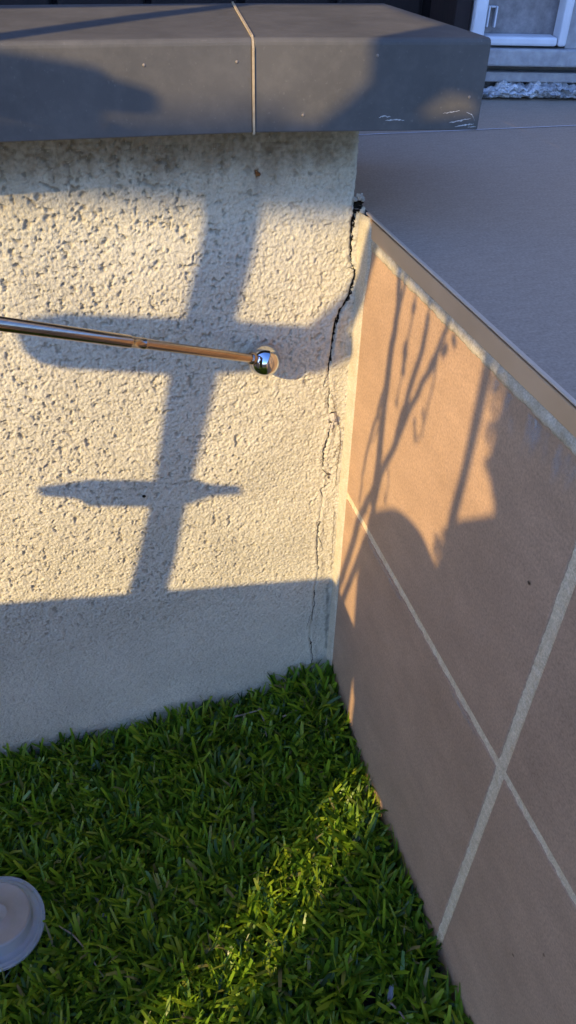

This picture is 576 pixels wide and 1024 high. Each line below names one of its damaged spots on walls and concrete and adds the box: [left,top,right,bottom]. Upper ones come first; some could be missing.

crack [307,206,360,669]